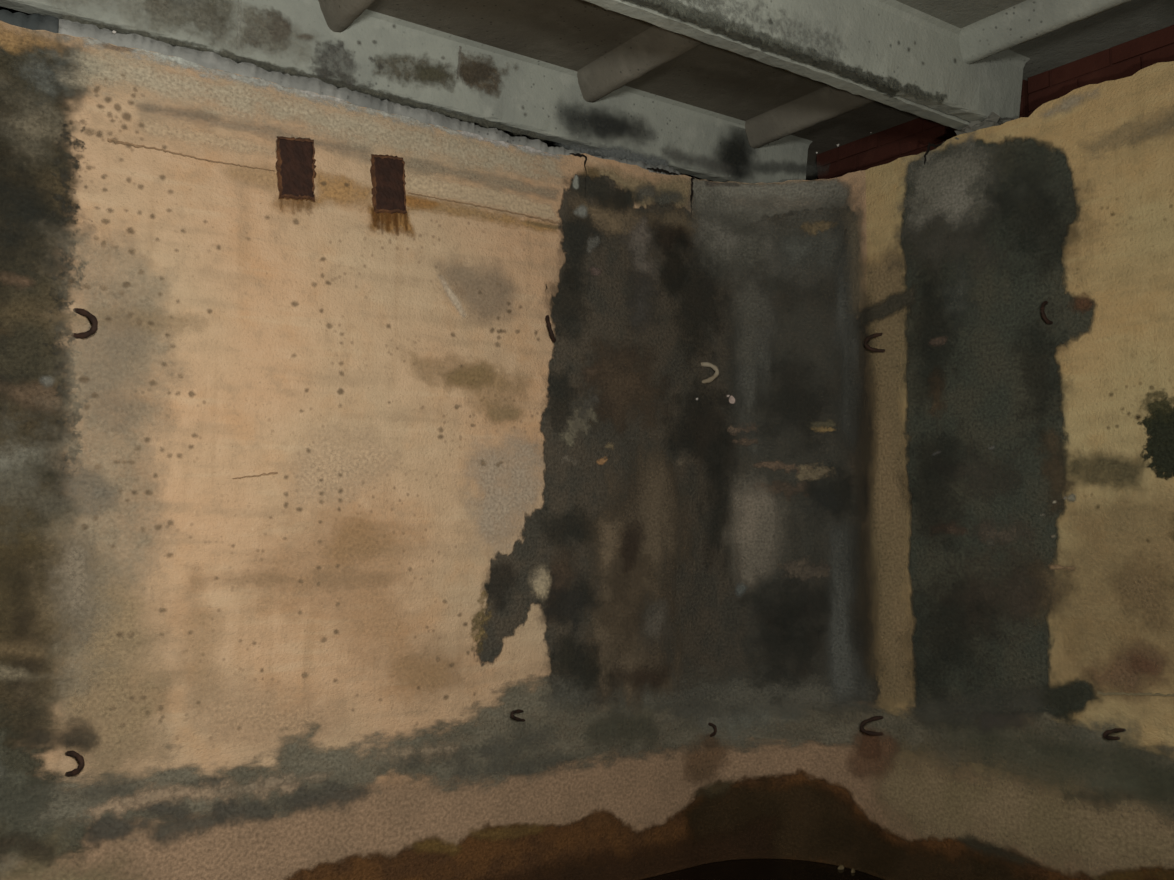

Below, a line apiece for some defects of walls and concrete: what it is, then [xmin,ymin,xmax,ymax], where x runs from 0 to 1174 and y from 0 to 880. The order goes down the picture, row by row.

water stain [62,0,545,140]
mould [626,0,947,103]
rust [317,175,558,236]
water stain [0,37,552,866]
water stain [28,137,1174,842]
water stain [287,770,1174,880]